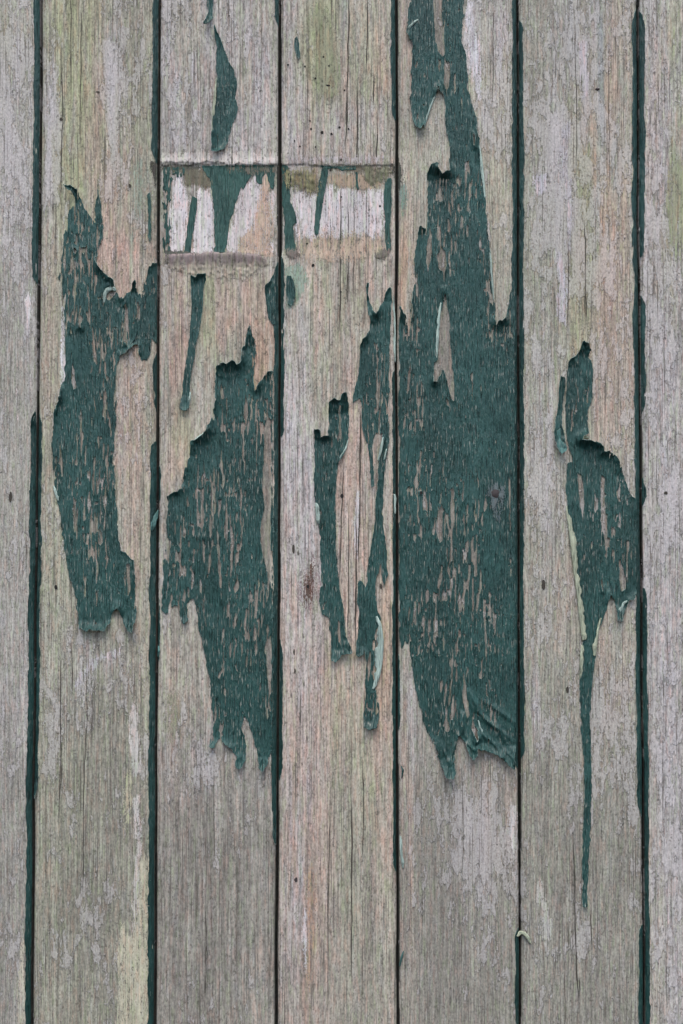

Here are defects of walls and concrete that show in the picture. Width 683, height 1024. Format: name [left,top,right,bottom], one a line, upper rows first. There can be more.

peeling [203,0,238,151]
peeling [51,184,161,633]
peeling [180,273,206,411]
peeling [161,325,274,772]
peeling [314,0,517,780]
peeling [554,340,638,908]